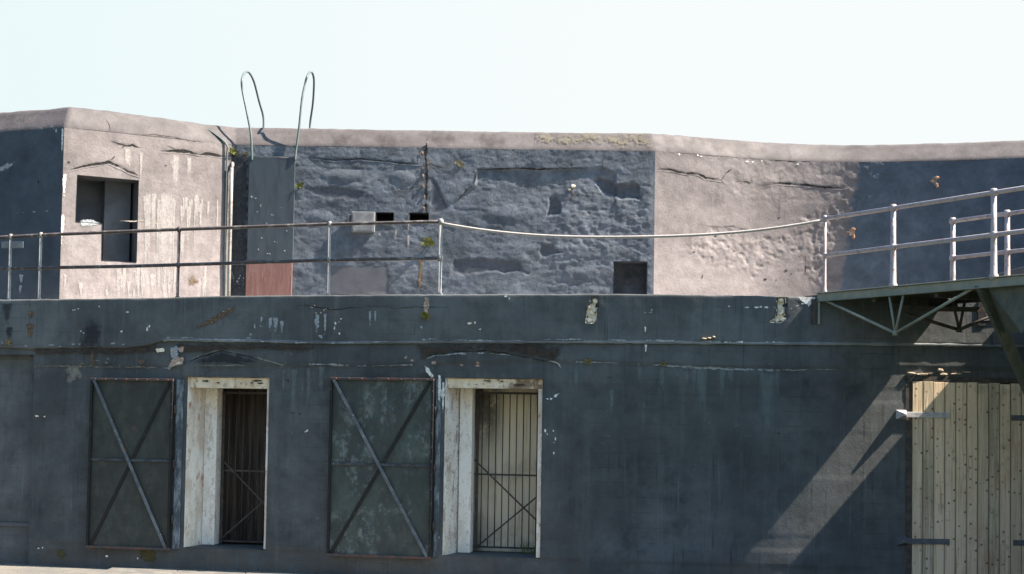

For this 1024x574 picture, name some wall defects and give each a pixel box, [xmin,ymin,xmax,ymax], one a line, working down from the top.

crack [70,121,226,179]
crack [311,142,603,215]
crack [657,145,842,212]
damp [105,156,218,298]
spalling [585,298,598,324]
spalling [745,297,815,323]
peeling [60,317,308,382]